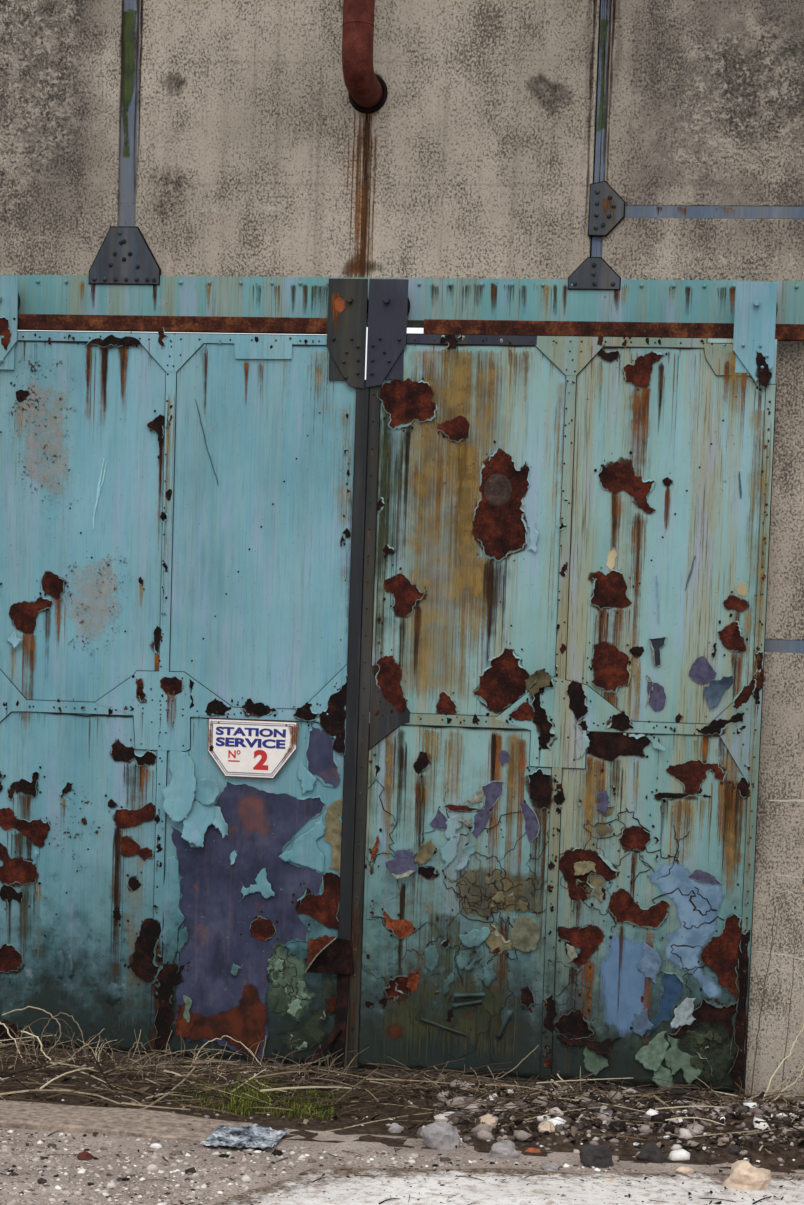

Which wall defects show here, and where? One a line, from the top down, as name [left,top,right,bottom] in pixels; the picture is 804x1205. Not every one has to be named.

corrosion [344,112,376,278]
corrosion [253,285,345,317]
corrosion [0,316,150,520]
corrosion [367,344,772,1063]
corrosion [0,739,190,1054]
peeling [153,727,343,1059]
peeling [385,781,504,879]
peeling [688,869,722,885]
peeling [583,1046,609,1076]
peeling [630,936,702,1090]
corrosion [666,906,750,1091]